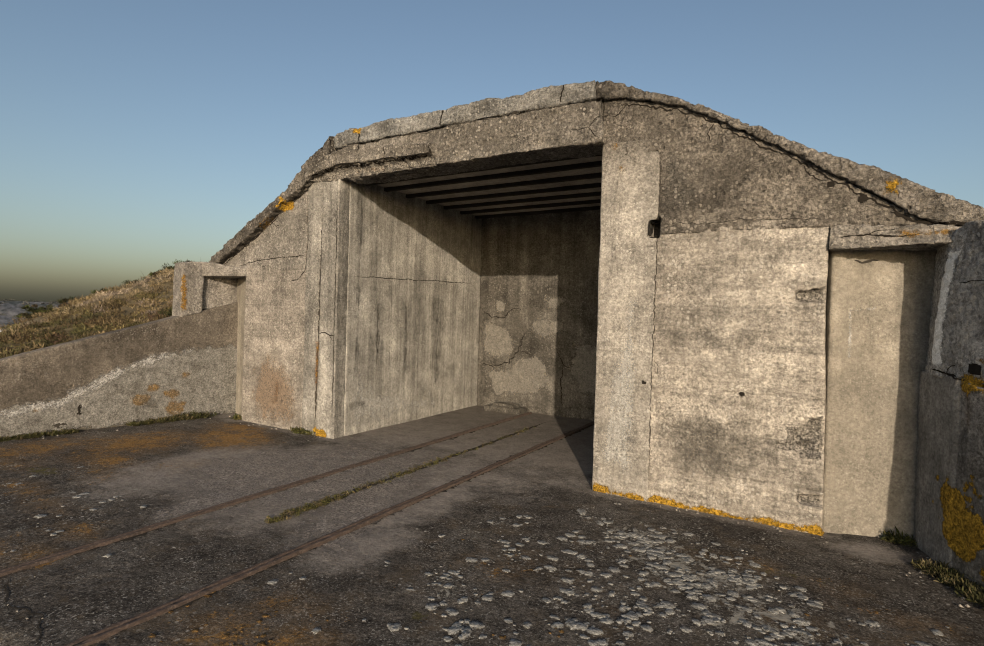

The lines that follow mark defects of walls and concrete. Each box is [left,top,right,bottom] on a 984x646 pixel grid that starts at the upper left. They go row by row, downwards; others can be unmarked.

crack [225,85,966,427]
crack [648,161,822,476]
spalling [774,416,823,461]